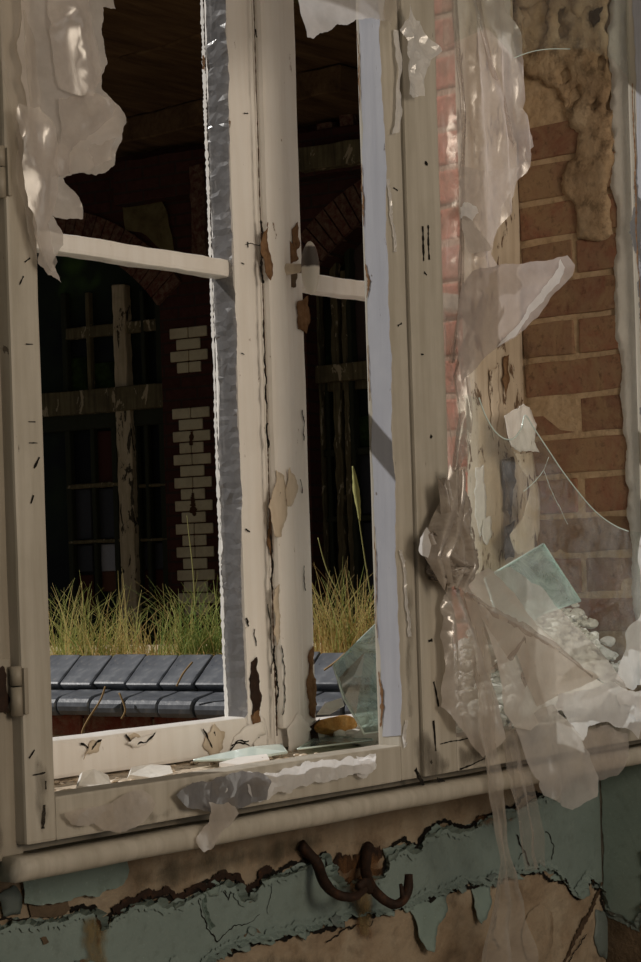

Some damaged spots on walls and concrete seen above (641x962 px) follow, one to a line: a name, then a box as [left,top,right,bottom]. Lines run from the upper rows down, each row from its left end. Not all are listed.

peeling [260,223,273,280]
peeling [290,222,300,288]
peeling [297,296,310,333]
peeling [267,468,298,555]
peeling [203,657,270,767]
spalling [0,784,556,945]
spalling [201,860,641,962]